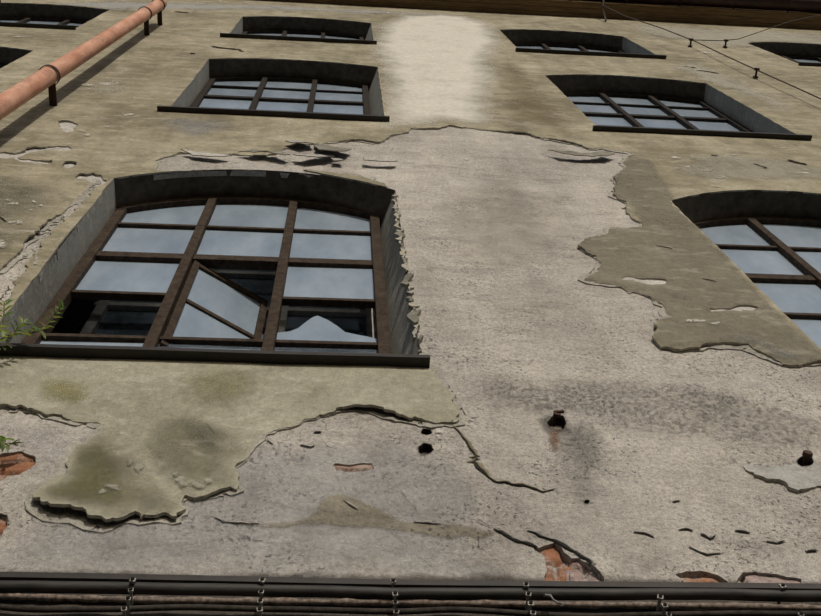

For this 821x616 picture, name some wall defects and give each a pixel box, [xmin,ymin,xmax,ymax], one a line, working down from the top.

leakage [377,15,497,123]
peeling [59,122,90,136]
peeling [0,126,821,583]
crack [452,420,555,492]